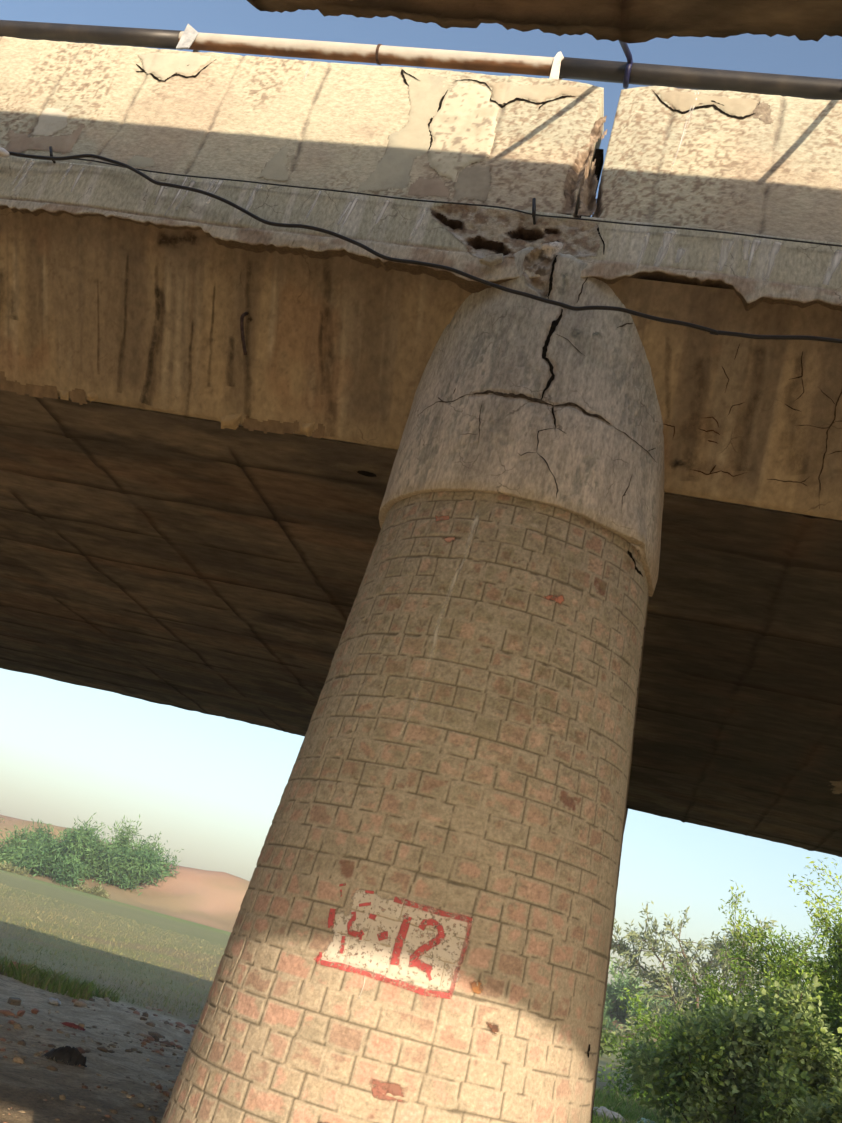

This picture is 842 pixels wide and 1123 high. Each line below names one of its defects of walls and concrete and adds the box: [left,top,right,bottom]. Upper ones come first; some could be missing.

peeling [6,108,85,154]
peeling [138,52,211,80]
peeling [357,71,599,193]
peeling [656,90,774,124]
spalling [431,115,607,297]
crack [421,255,842,509]